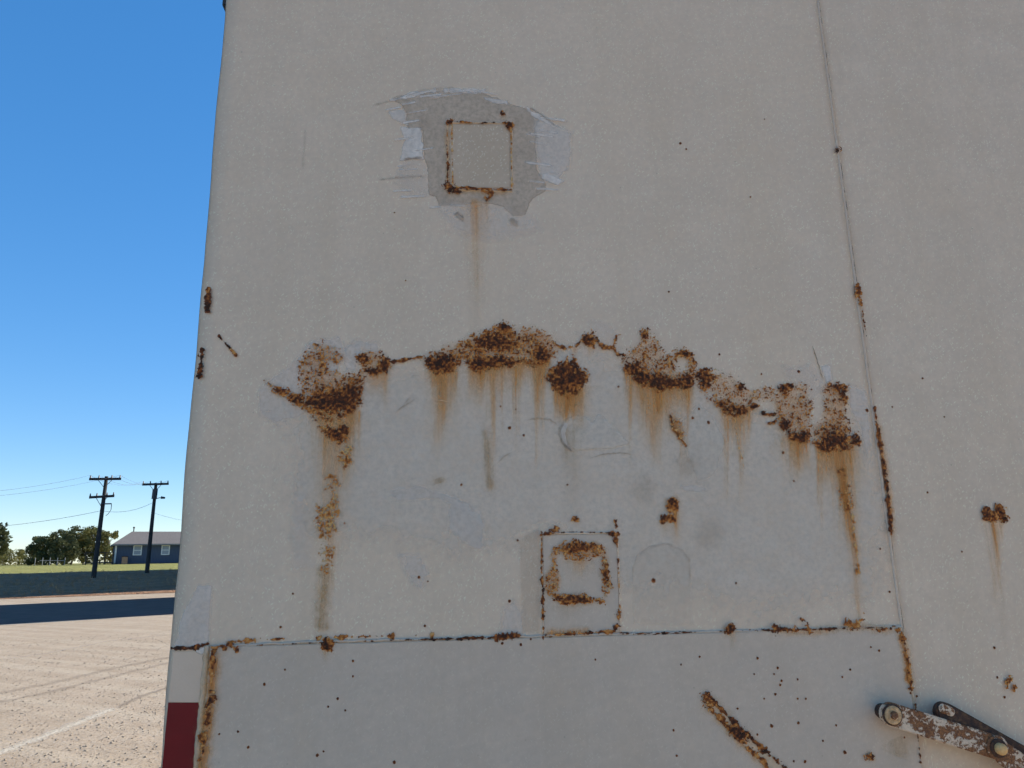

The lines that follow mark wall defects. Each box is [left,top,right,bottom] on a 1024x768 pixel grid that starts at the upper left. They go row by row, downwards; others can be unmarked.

peeling [386,88,569,216]
corrosion [441,110,515,201]
corrosion [263,319,862,575]
corrosion [865,406,893,535]
corrosion [981,503,1010,543]
corrosion [197,516,692,768]
corrosion [749,612,918,710]
corrosion [699,692,806,768]